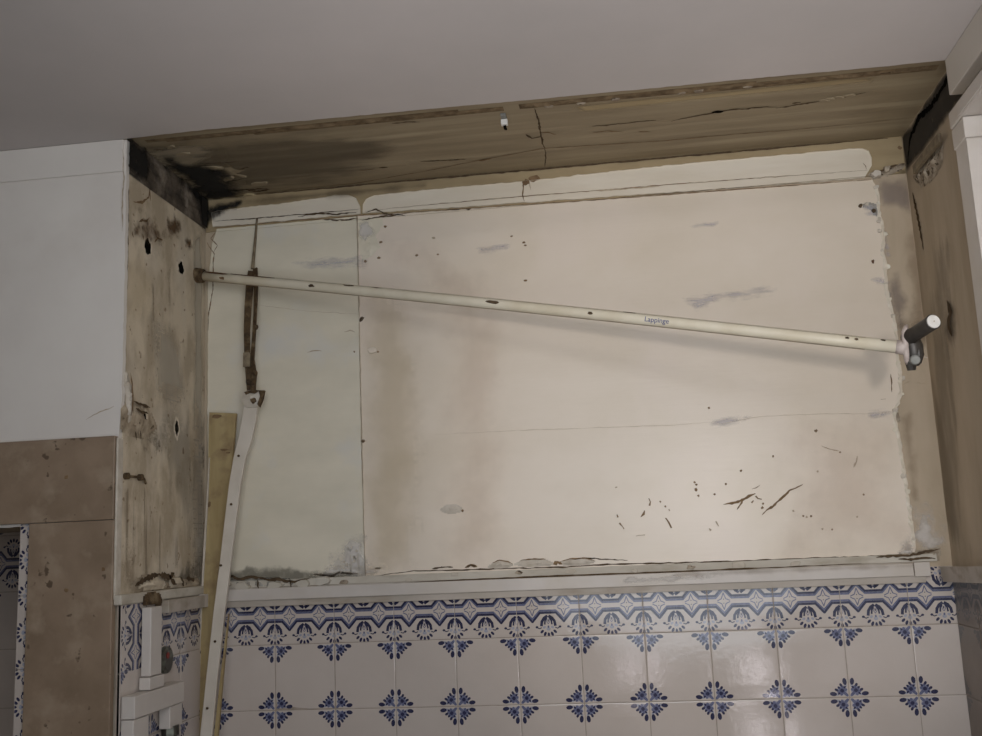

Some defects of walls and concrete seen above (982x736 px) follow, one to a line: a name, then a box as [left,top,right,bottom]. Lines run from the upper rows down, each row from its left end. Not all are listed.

water stain [168,217,181,233]
water stain [165,158,241,222]
crack [207,76,948,328]
flaking render [120,369,157,440]
flaking render [229,571,356,589]